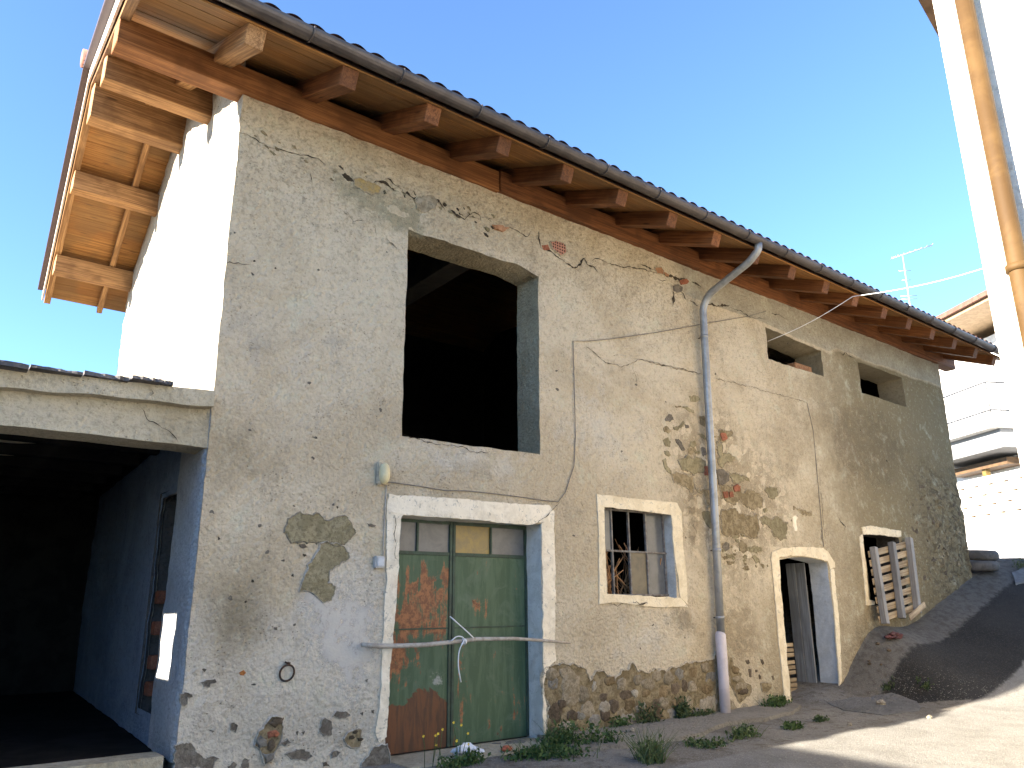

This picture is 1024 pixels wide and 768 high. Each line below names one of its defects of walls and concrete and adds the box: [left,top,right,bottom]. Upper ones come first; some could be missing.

flaking render [330,165,509,237]
crack [357,178,784,319]
flaking render [662,395,812,579]
flaking render [283,503,356,603]
spalling [172,710,391,768]